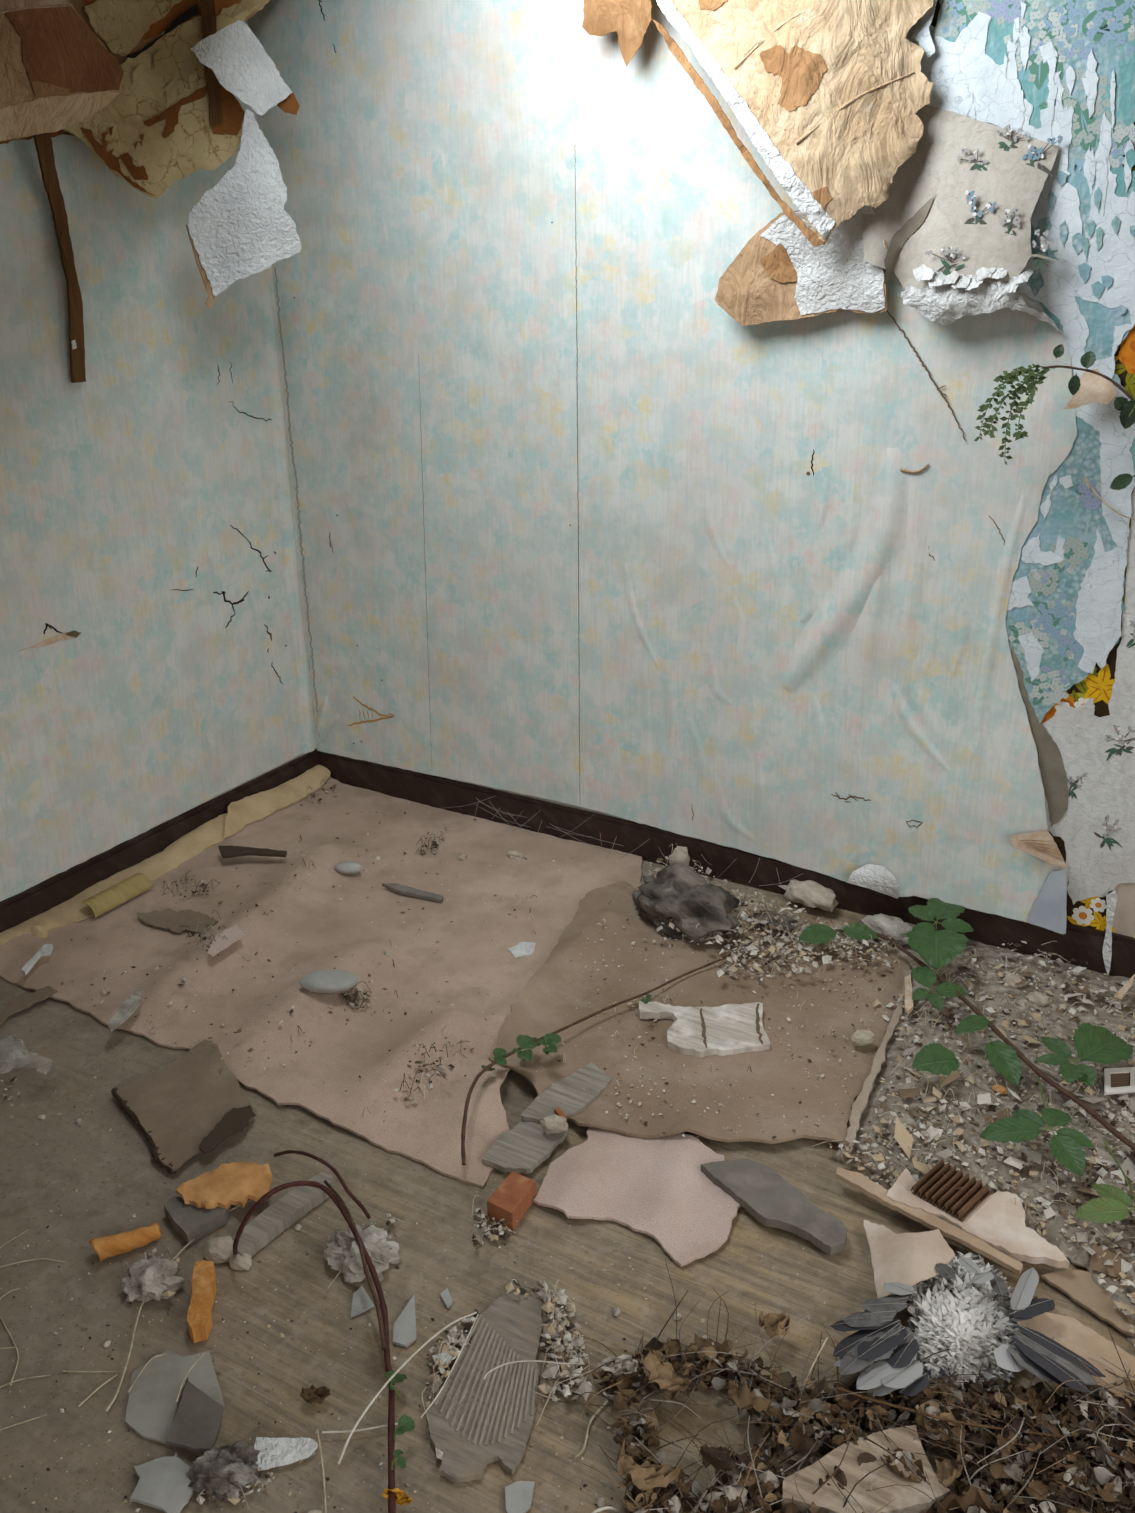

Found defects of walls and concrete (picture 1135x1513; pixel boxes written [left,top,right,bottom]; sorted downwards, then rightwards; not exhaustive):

peeling [913,2,1135,674]
crack [174,525,283,684]
peeling [1018,632,1044,682]